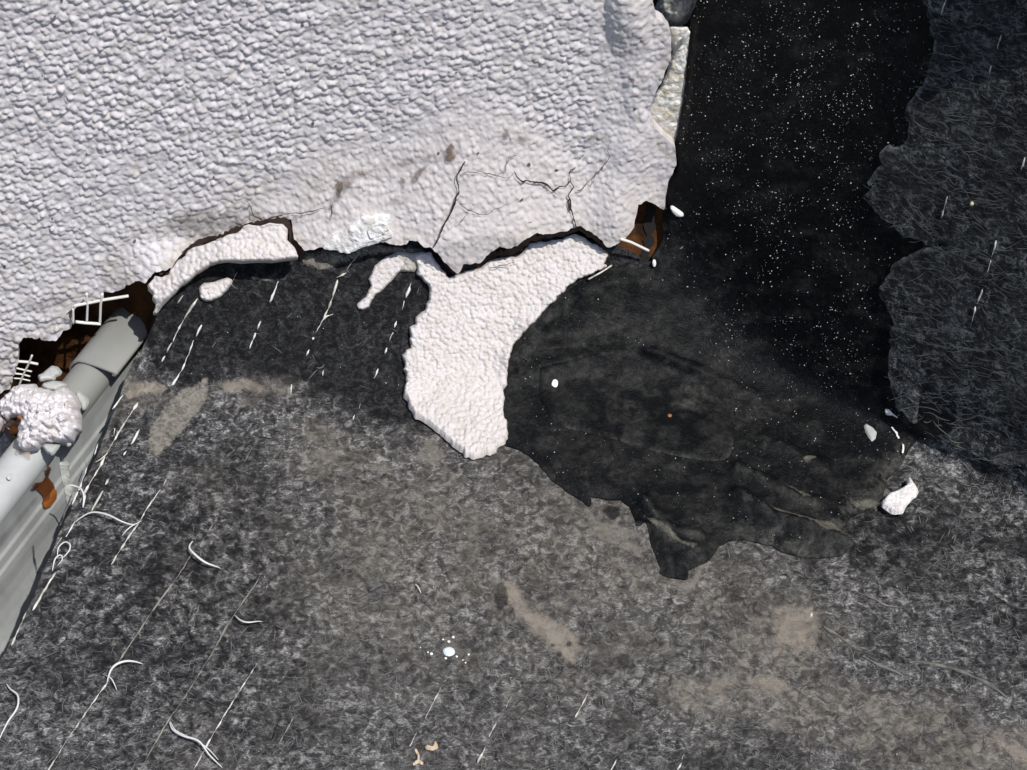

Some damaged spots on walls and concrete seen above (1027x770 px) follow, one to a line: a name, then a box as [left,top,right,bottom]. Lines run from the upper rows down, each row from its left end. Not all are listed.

crack [432,143,610,274]
spalling [323,214,393,254]
spalling [616,201,663,262]
spalling [1,223,298,411]
spalling [7,415,22,437]
spalling [42,442,71,456]
rust [32,466,57,508]
water stain [585,506,641,555]
water stain [651,518,694,547]
water stain [765,501,846,533]
water stain [855,500,878,510]